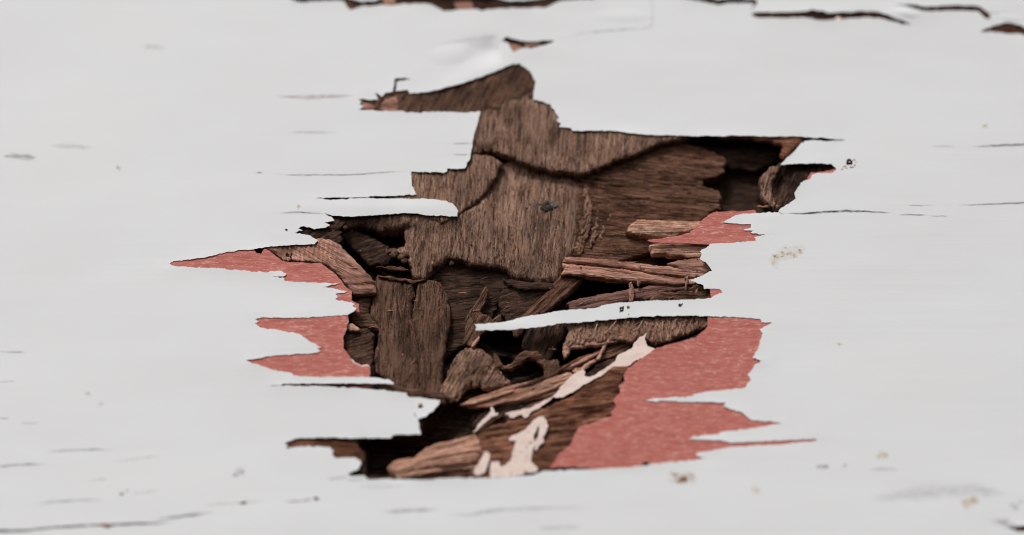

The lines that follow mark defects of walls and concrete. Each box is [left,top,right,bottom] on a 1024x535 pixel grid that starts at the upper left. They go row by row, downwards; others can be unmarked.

peeling [170,249,374,389]
peeling [684,276,722,297]
peeling [647,210,764,245]
peeling [549,316,817,469]